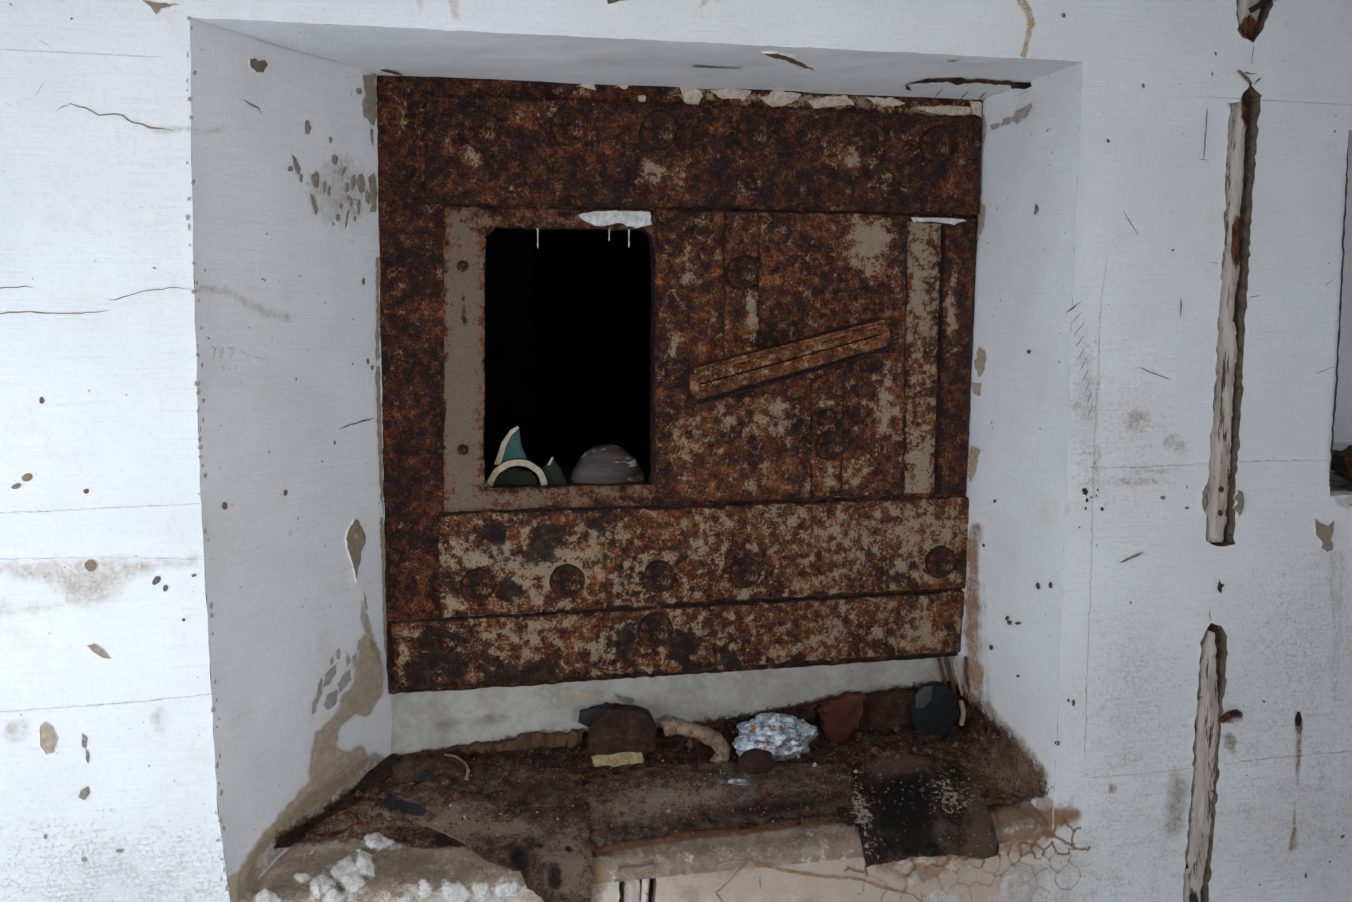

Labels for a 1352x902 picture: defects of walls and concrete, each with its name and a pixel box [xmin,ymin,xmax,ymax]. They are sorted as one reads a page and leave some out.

rust [1018,0,1035,57]
peeling [356,74,377,146]
peeling [288,137,378,228]
spalling [1233,489,1244,519]
water stain [238,613,384,896]
crack [716,820,1091,902]